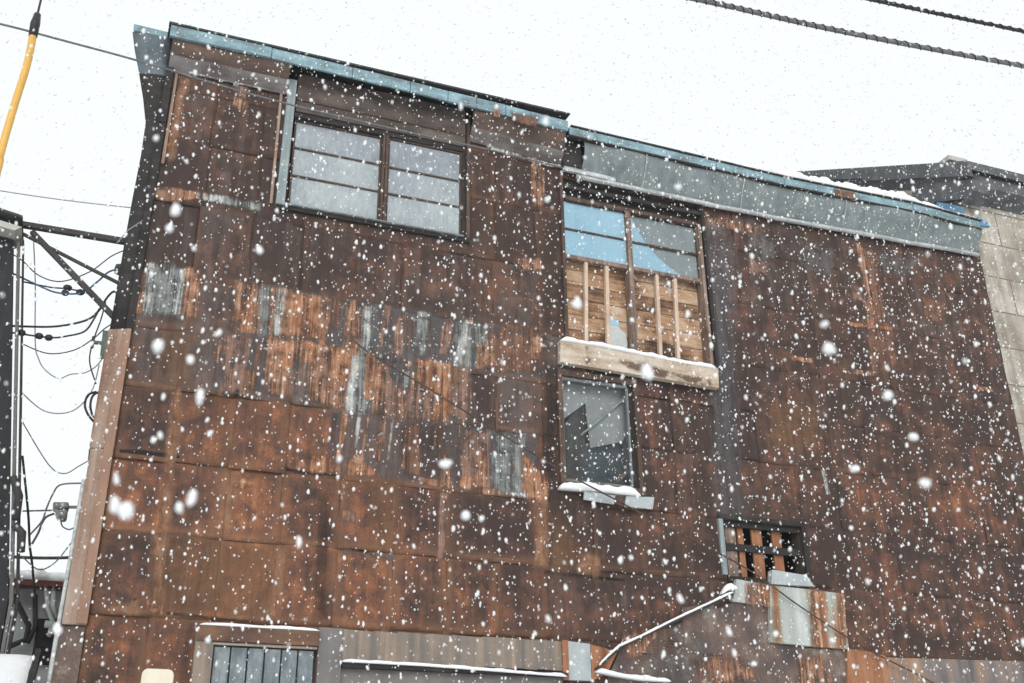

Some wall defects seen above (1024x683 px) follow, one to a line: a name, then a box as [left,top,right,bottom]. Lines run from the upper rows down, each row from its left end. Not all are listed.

corrosion [706,218,758,234]
peeling [135,263,200,318]
peeling [332,299,376,413]
peeling [440,320,488,369]
corrosion [849,243,897,382]
corrosion [922,296,945,324]
corrosion [215,281,543,560]
peeling [482,433,548,501]
corrosion [112,390,180,614]
corrosion [535,500,547,566]
corrosion [745,582,770,607]
corrosion [798,590,832,683]